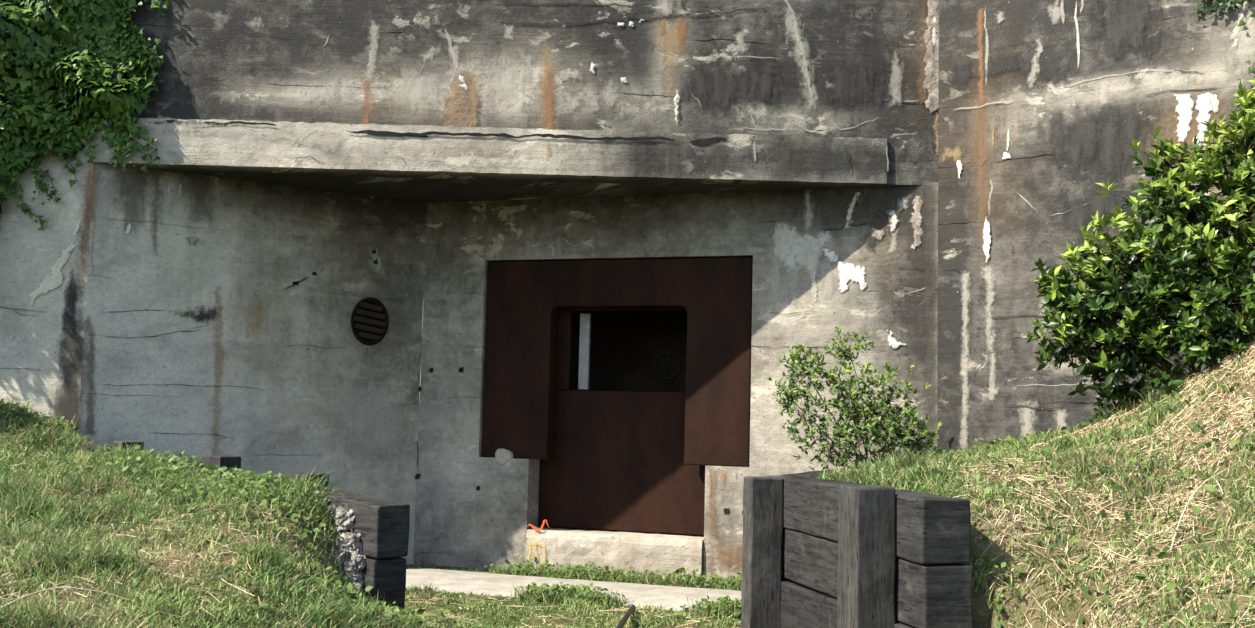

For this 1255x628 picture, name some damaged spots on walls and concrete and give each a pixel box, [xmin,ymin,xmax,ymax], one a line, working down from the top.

rust [362,25,377,124]
crack [149,0,875,171]
rust [975,10,988,222]
water stain [948,0,1219,175]
peeling [28,219,81,306]
rust [79,164,93,287]
peeling [822,248,867,292]
water stain [1063,185,1155,230]
water stain [55,272,88,429]